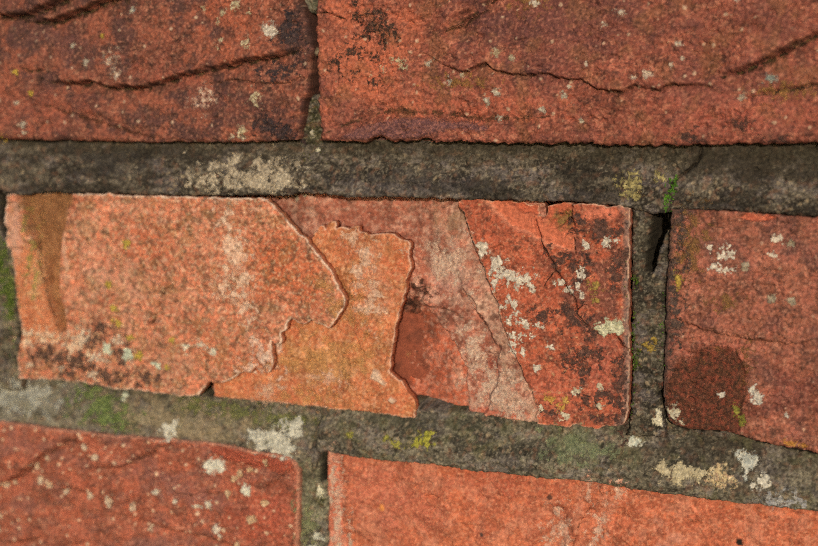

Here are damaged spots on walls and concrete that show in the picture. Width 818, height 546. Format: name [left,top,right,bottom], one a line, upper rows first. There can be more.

damp [0,246,92,365]
peeling [4,192,634,429]
crack [534,216,587,312]